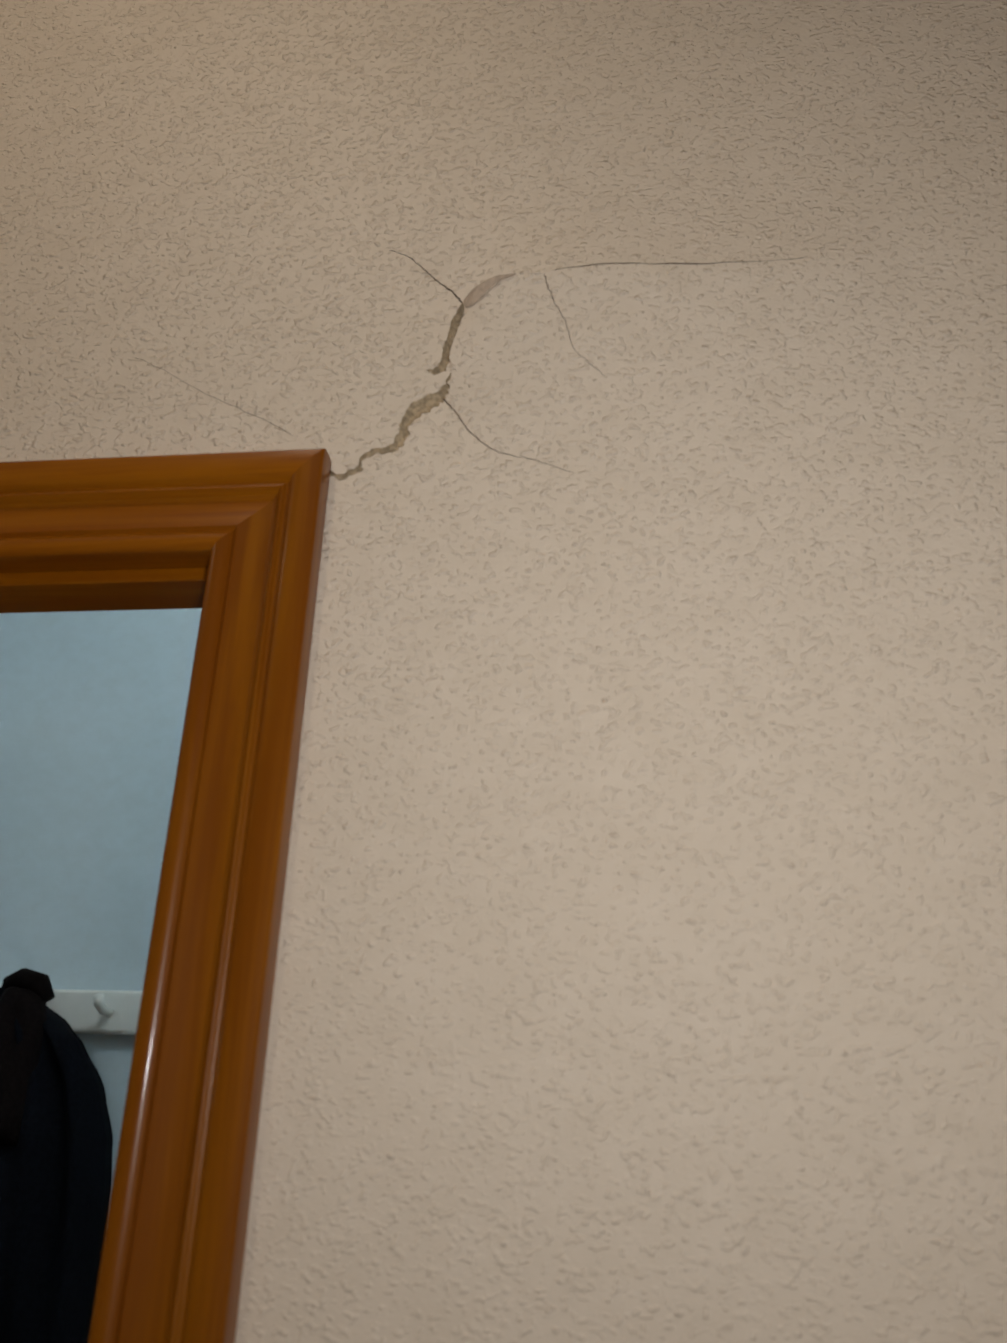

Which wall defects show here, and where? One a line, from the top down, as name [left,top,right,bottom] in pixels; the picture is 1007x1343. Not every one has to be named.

crack [330,250,573,481]
crack [520,256,808,376]